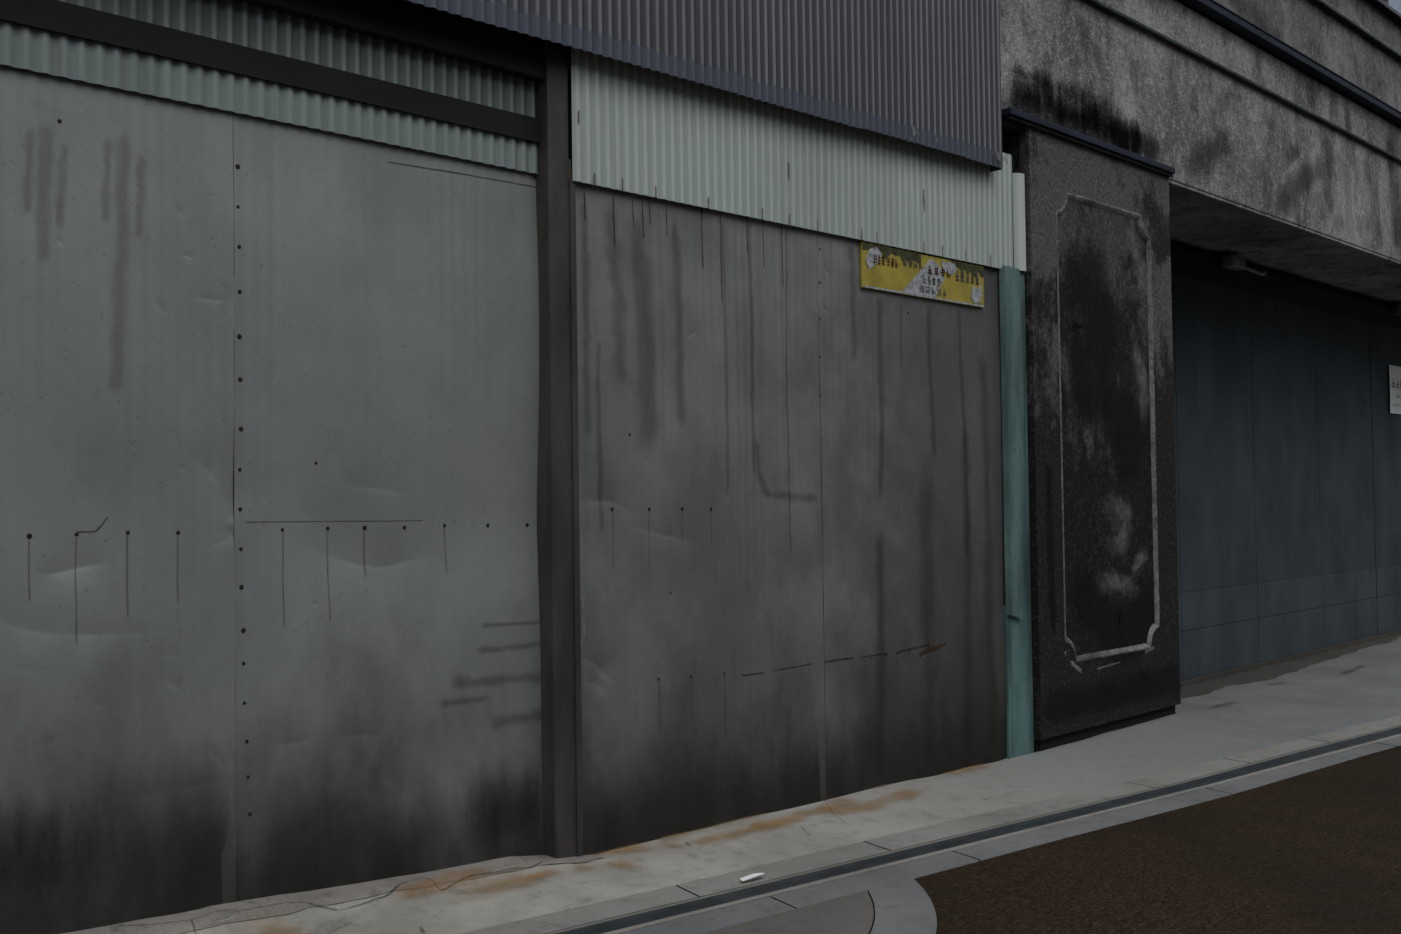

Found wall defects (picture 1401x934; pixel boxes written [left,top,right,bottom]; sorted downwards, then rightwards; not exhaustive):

leakage [1013,67,1141,153]